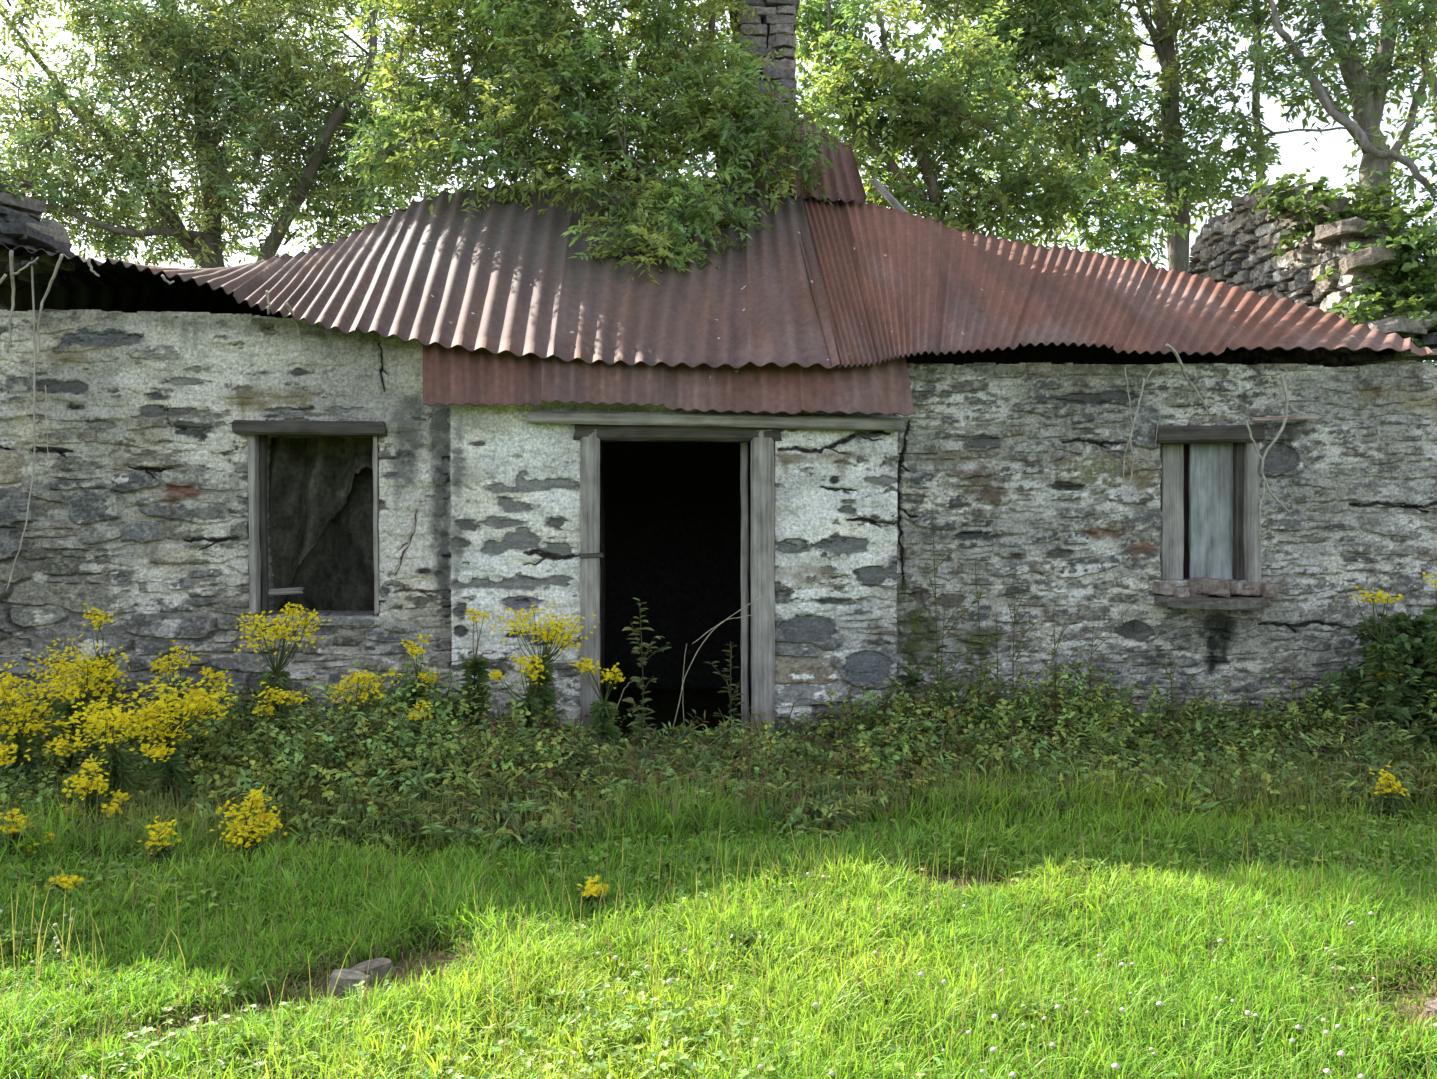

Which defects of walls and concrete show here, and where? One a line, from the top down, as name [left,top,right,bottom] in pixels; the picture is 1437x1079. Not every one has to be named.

peeling [864,475,897,486]
peeling [451,470,580,556]
peeling [837,506,855,514]
peeling [451,574,572,637]
peeling [776,536,965,641]
peeling [844,651,892,682]
damp [1205,615,1235,673]